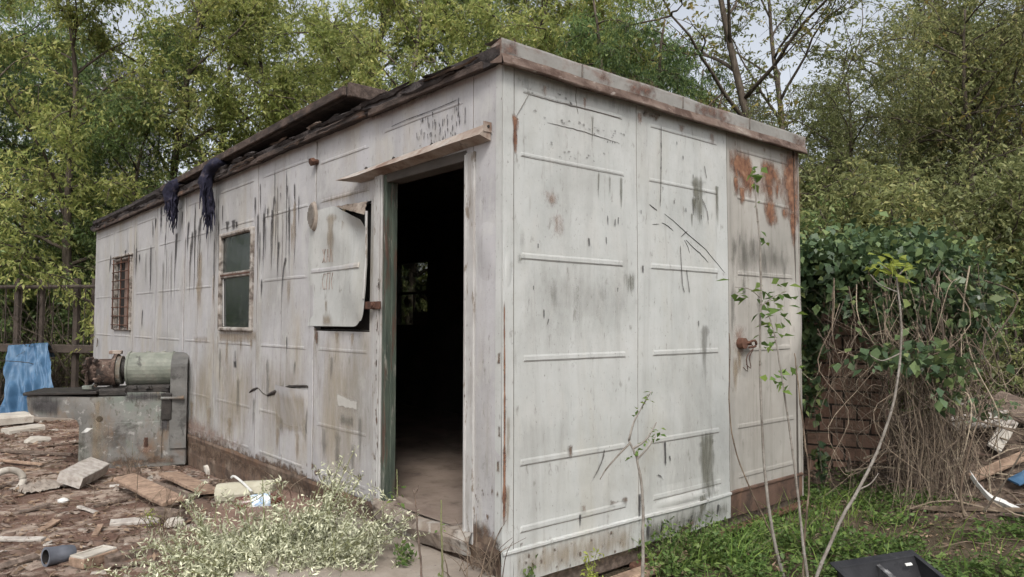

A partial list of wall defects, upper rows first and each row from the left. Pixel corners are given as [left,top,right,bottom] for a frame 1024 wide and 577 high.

leakage [125,199,237,289]
leakage [254,173,299,292]
leakage [691,179,702,218]
corrosion [730,139,804,243]